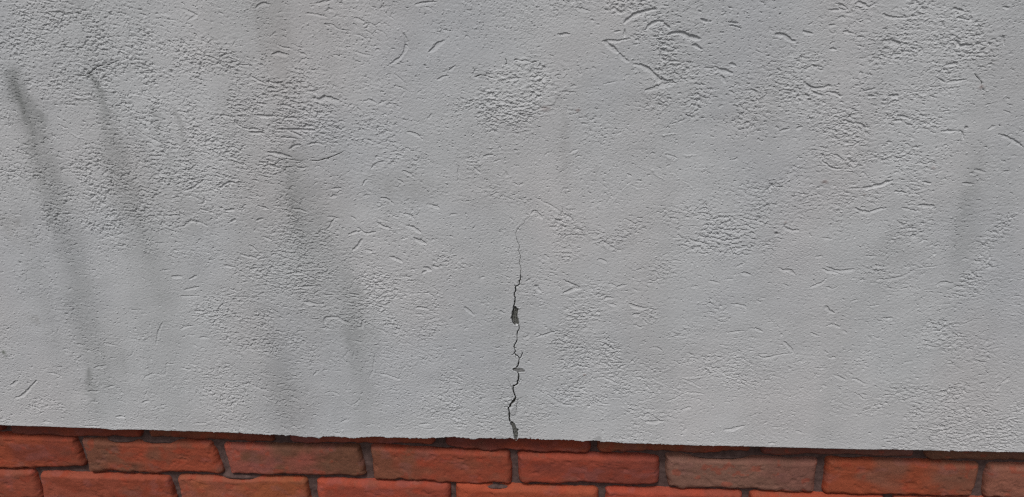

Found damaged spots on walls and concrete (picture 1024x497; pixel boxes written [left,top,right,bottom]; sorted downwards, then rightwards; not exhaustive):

crack [505,216,530,421]